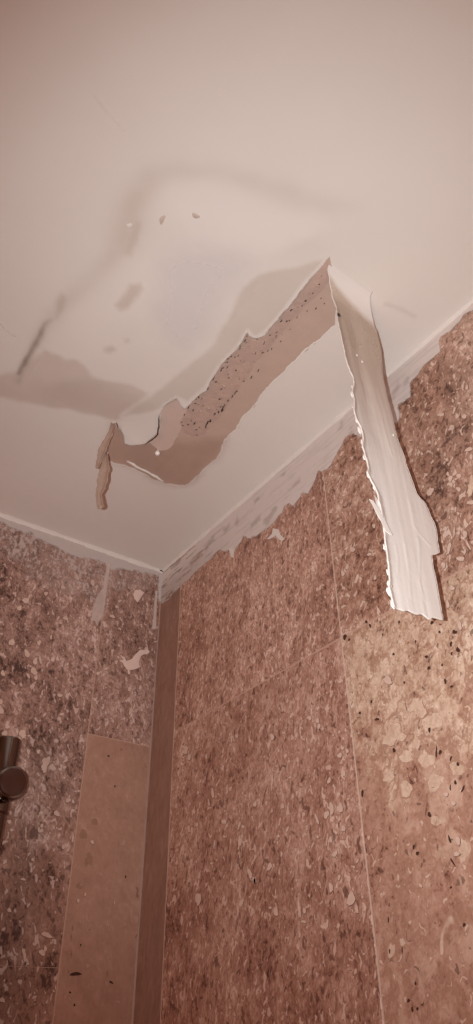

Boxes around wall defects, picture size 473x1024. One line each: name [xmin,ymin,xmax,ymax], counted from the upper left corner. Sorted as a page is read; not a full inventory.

peeling [95,257,443,620]